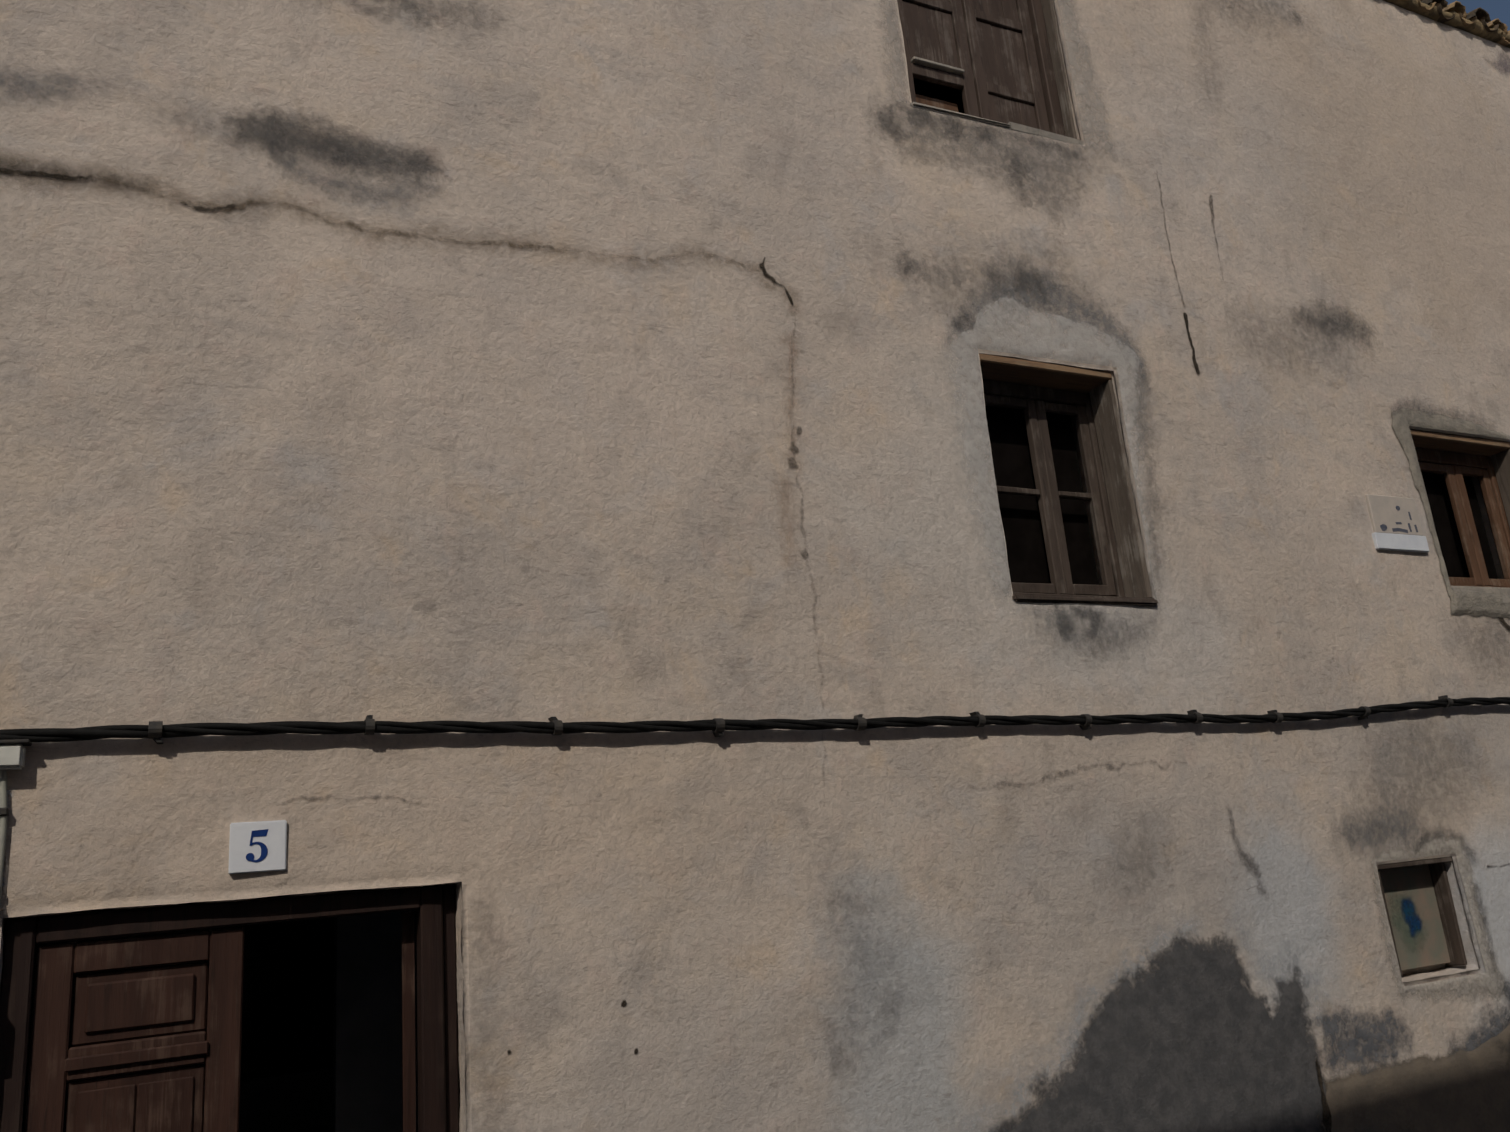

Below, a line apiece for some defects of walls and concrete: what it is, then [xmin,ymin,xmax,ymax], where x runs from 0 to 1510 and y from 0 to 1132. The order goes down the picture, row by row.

crack [0,168,110,181]
damp [236,112,440,197]
crack [181,200,303,211]
crack [759,257,793,305]
crack [1159,182,1200,374]
crack [789,427,802,468]
crack [1232,821,1262,891]